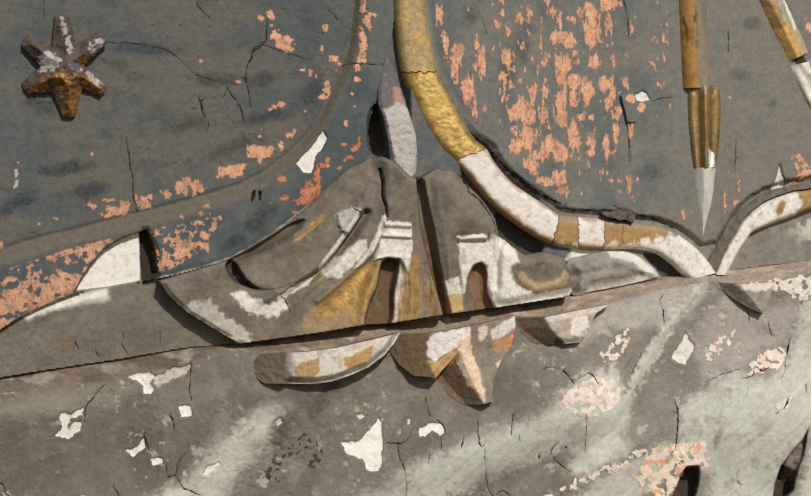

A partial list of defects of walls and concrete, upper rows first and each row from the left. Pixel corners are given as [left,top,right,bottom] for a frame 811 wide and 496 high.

crack [105,19,307,130]
peeling [354,0,377,82]
peeling [435,0,649,203]
peeling [87,177,207,218]
peeling [216,128,296,179]
peeling [280,131,361,214]
peeling [154,204,222,271]
peeling [0,232,140,329]
peeling [750,274,811,301]
spalling [55,408,84,439]
spalling [341,419,383,471]
peeling [544,441,711,496]